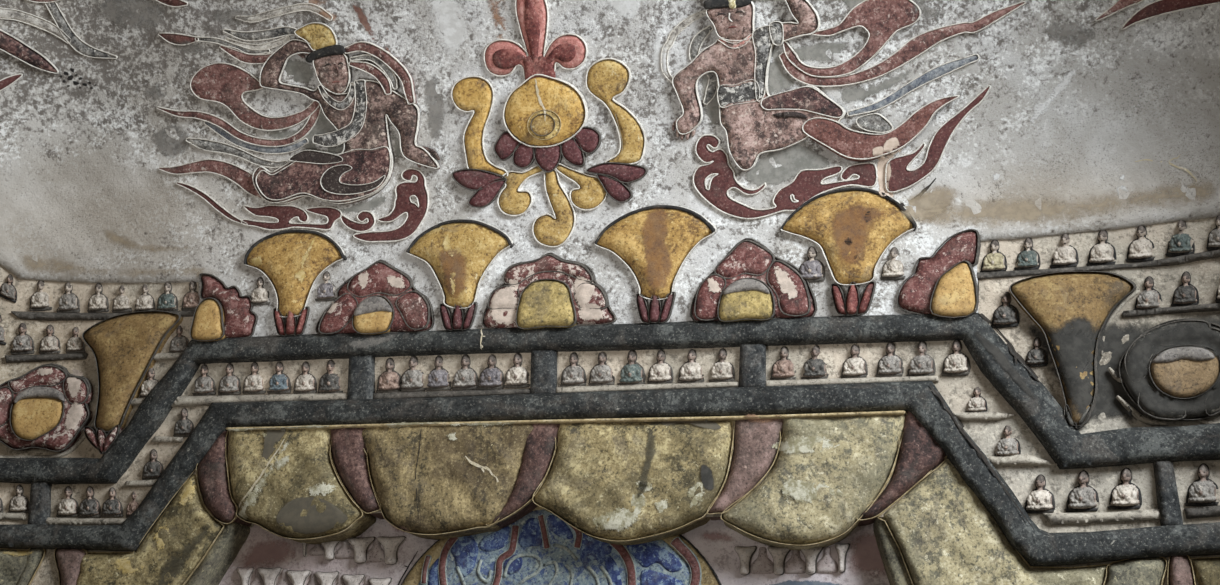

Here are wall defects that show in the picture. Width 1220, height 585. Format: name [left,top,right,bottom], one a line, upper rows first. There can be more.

damp [904,175,1212,222]
peeling [490,279,519,326]
peeling [574,276,603,321]
peeling [708,278,721,293]
peeling [774,266,798,299]
crack [465,456,499,482]